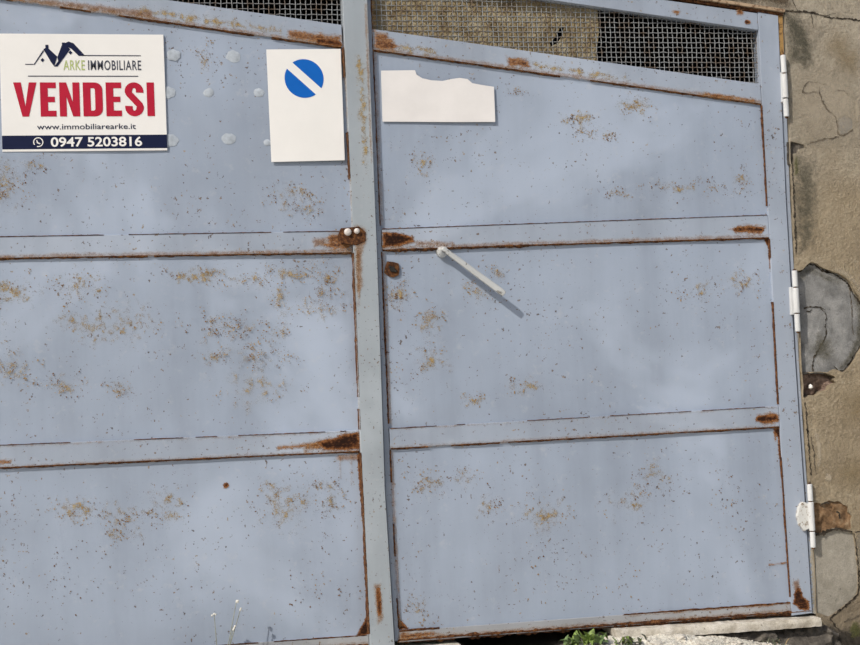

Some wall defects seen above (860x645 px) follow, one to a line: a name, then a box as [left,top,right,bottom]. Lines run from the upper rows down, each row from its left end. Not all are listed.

crack [785,0,860,27]
rust [0,179,366,401]
rust [356,0,771,429]
spalling [797,263,860,397]
rust [0,409,382,645]
rust [389,446,428,482]
rust [396,302,810,644]
spalling [808,501,860,616]